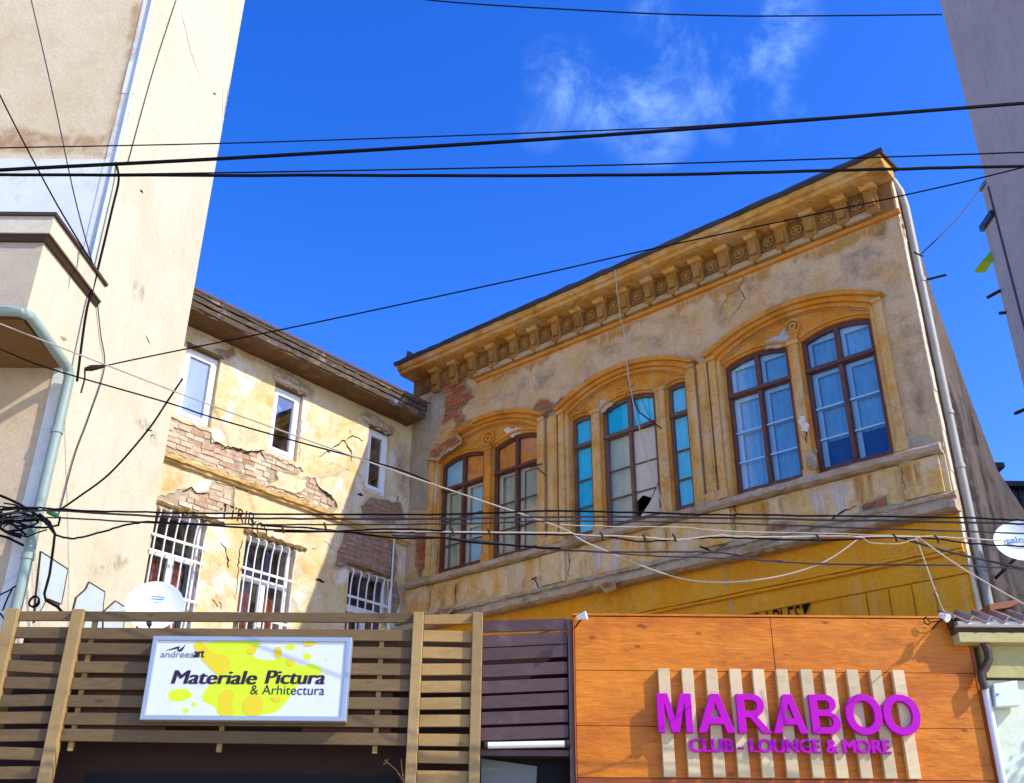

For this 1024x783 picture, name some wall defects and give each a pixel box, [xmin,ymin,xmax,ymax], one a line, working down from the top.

flaking render [156,416,338,516]
crack [299,419,363,463]
flaking render [426,376,475,469]
flaking render [333,457,429,613]